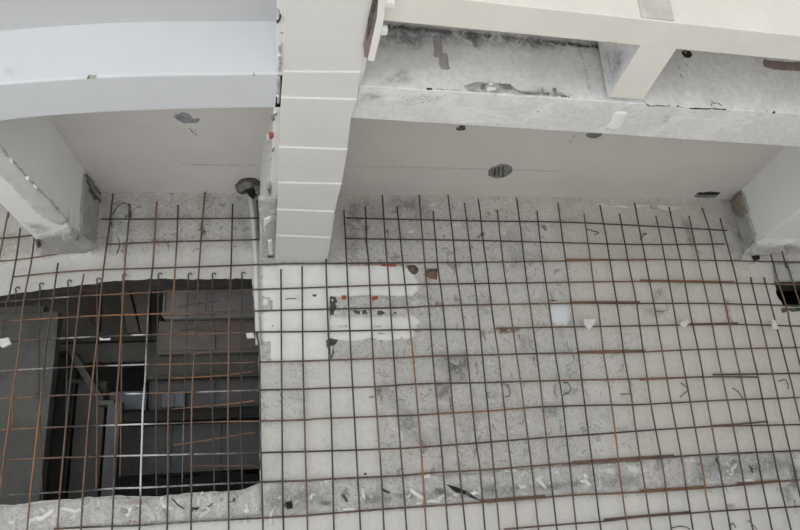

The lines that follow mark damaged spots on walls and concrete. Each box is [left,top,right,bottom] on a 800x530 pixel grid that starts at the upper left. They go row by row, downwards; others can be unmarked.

peeling [431,35,450,70]
peeling [763,59,800,71]
peeling [464,81,569,98]
spalling [168,112,200,137]